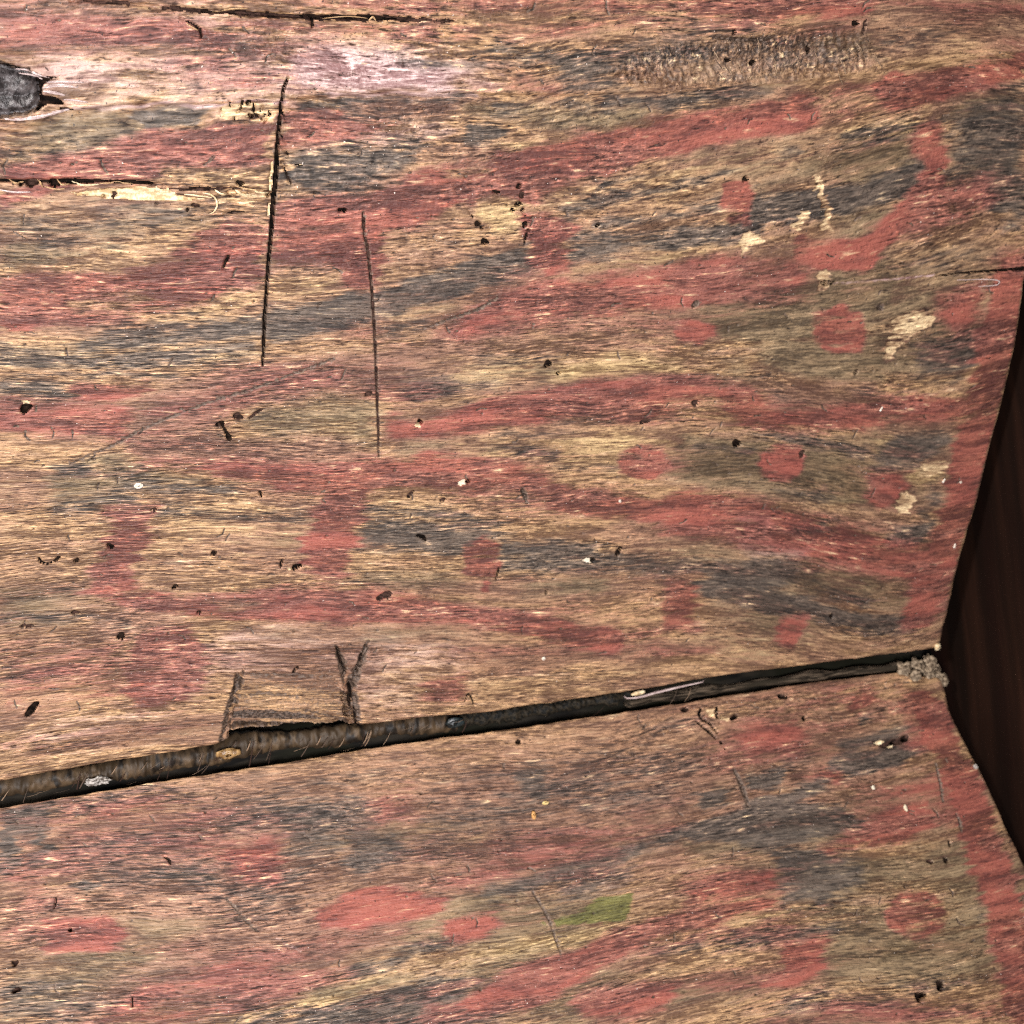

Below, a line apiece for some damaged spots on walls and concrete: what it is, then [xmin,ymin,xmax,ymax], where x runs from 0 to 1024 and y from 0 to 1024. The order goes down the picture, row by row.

crack [83,0,454,38]